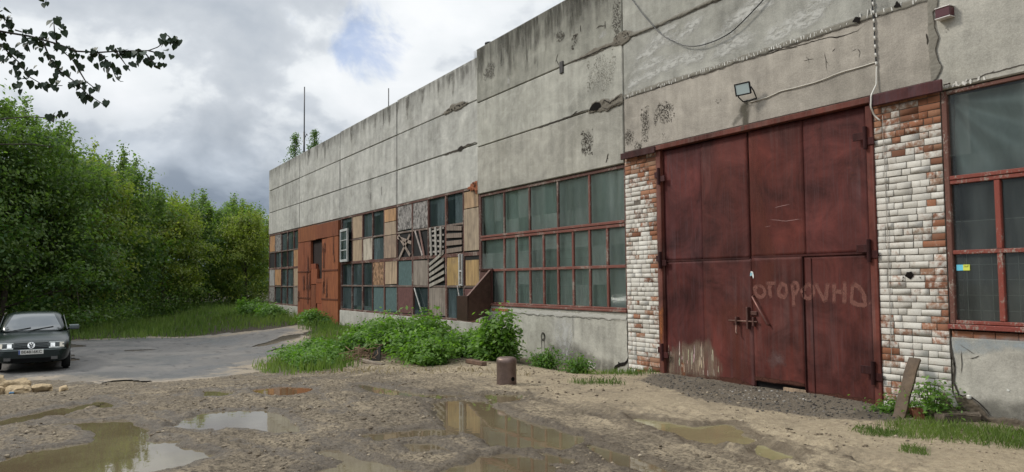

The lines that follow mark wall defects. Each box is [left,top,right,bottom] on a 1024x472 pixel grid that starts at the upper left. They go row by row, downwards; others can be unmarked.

spalling [556,0,637,113]
spalling [443,101,467,115]
peeling [669,341,719,376]